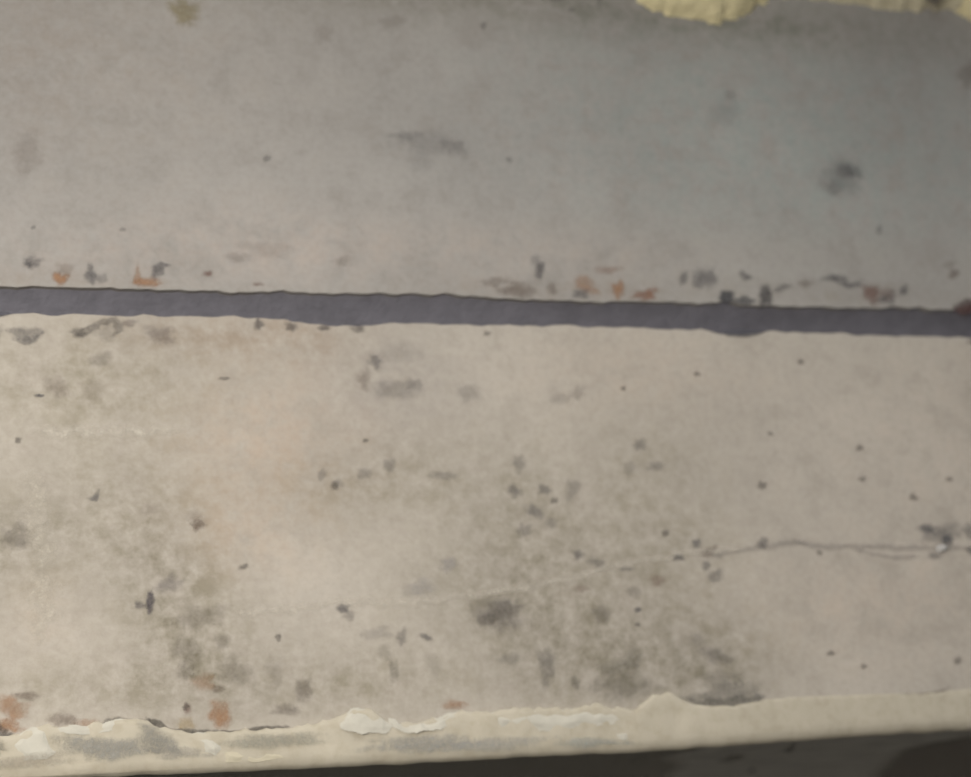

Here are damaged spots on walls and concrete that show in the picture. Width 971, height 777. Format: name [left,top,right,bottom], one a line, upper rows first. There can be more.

peeling [0,689,971,777]